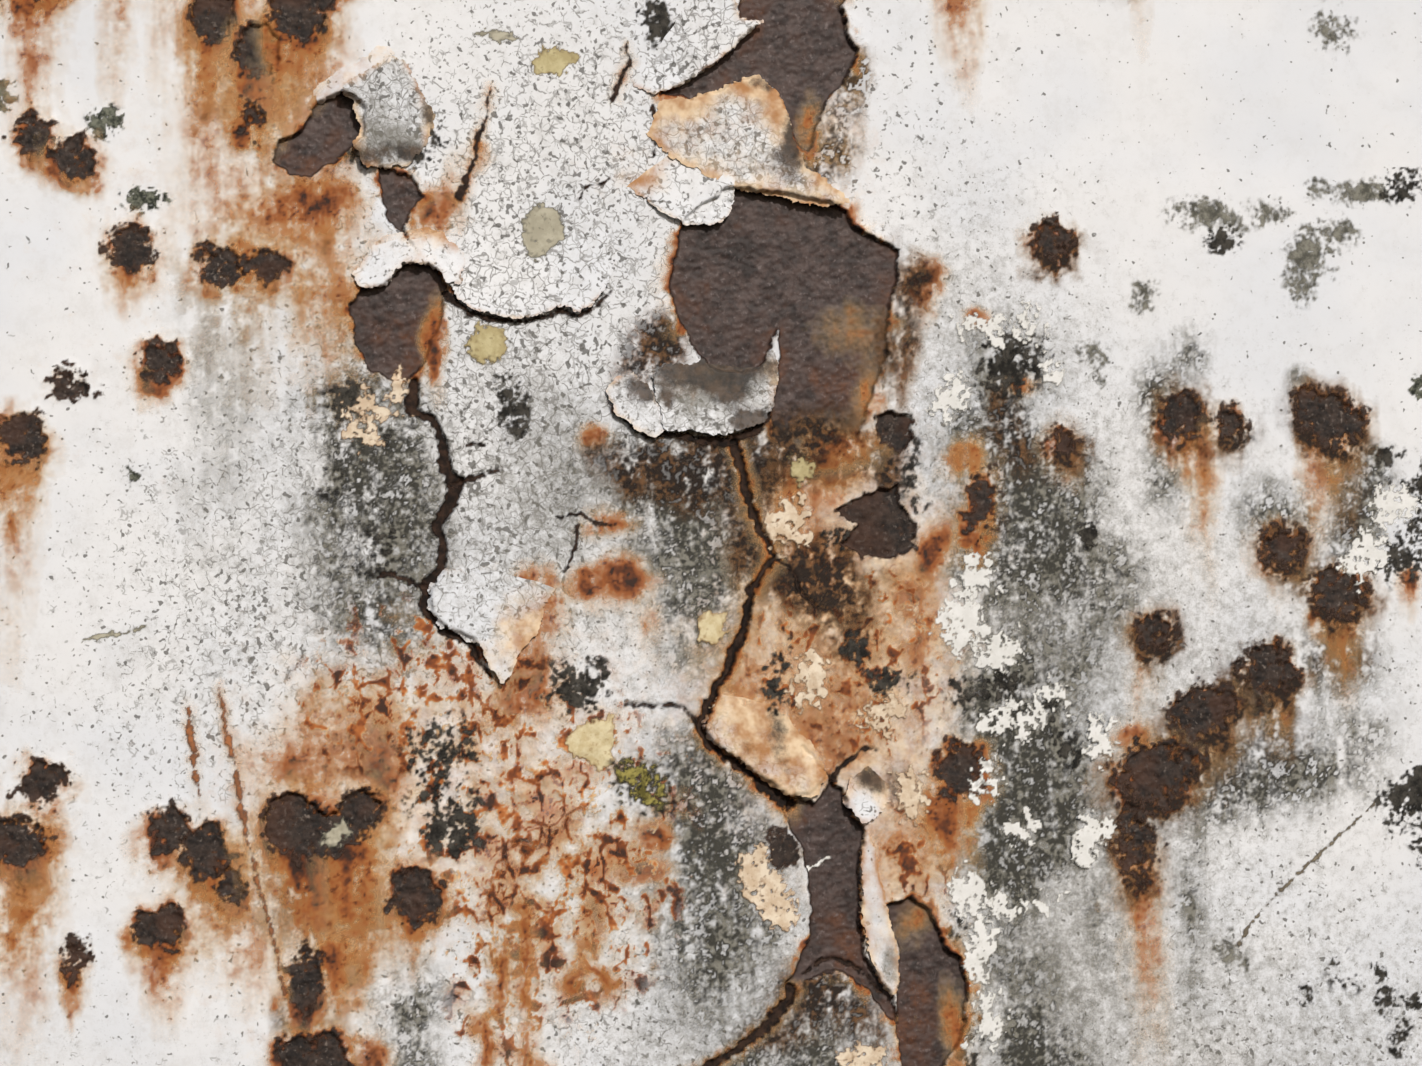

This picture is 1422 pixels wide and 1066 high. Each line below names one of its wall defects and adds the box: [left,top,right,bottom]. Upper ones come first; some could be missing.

rust [176,0,358,357]
peeling [272,45,465,455]
peeling [605,0,971,559]
leakage [304,367,452,654]
rust [120,554,682,1066]
crack [377,379,500,678]
crack [608,403,819,812]
crack [703,956,882,1066]
peeling [764,781,1070,1066]
mould [947,330,1139,1066]
rust [1105,635,1305,996]
leakage [1326,442,1422,582]